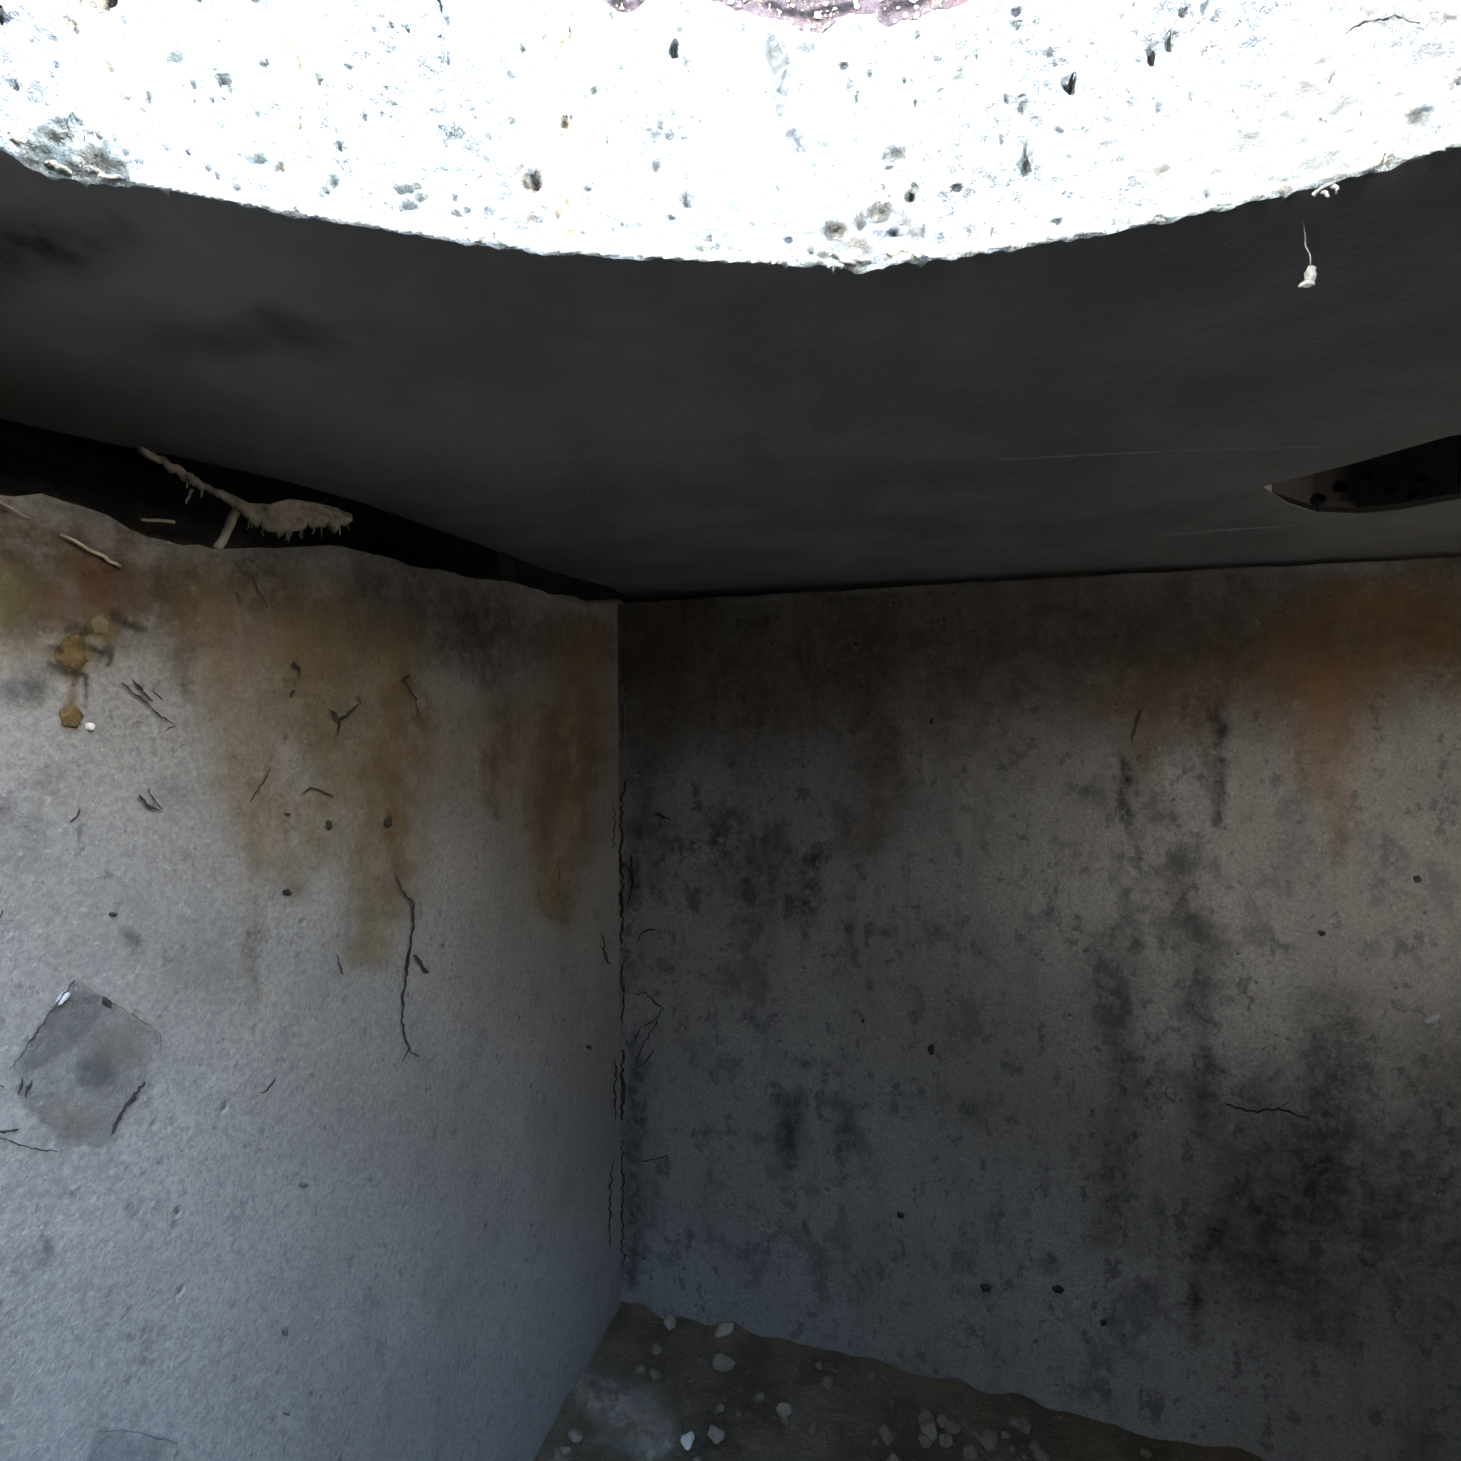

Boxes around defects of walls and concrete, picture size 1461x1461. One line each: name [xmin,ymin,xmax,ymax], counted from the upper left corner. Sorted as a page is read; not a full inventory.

peeling [727,0,859,34]
rust [765,0,854,19]
rust [882,0,923,10]
crack [1345,14,1420,34]
spalling [669,38,679,59]
spalling [1147,28,1172,67]
spalling [1064,71,1076,96]
spalling [0,111,130,181]
spalling [821,182,919,266]
crack [395,874,429,1062]
crack [600,668,670,1267]
crack [0,1078,58,1152]